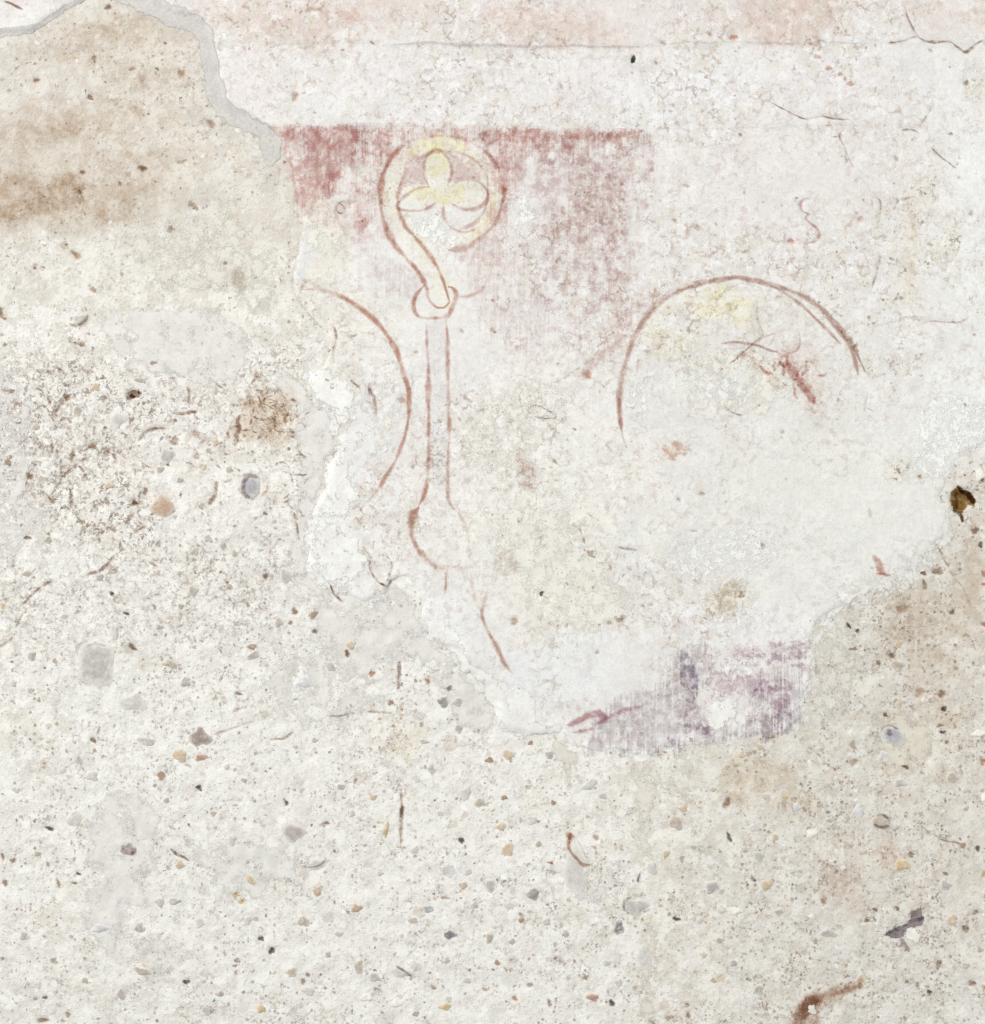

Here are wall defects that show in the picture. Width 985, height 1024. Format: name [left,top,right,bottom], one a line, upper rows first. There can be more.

crack [890,12,981,53]
peeling [292,198,346,255]
peeling [673,343,806,419]
spalling [300,346,397,598]
peeling [873,455,936,485]
spalling [950,486,982,548]
peeling [487,507,634,637]
spalling [606,570,894,762]
spalling [904,927,921,943]